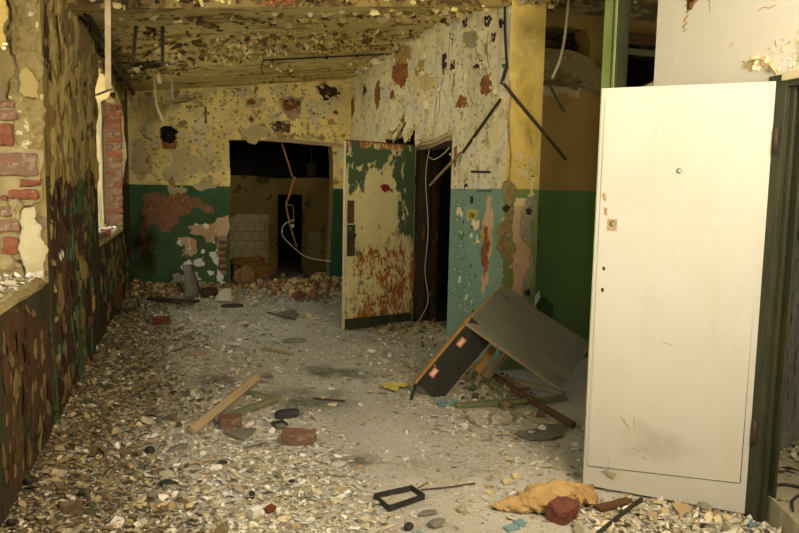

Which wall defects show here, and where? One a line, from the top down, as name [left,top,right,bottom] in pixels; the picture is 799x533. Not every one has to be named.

spalling [682,0,697,32]
peeling [742,30,799,76]